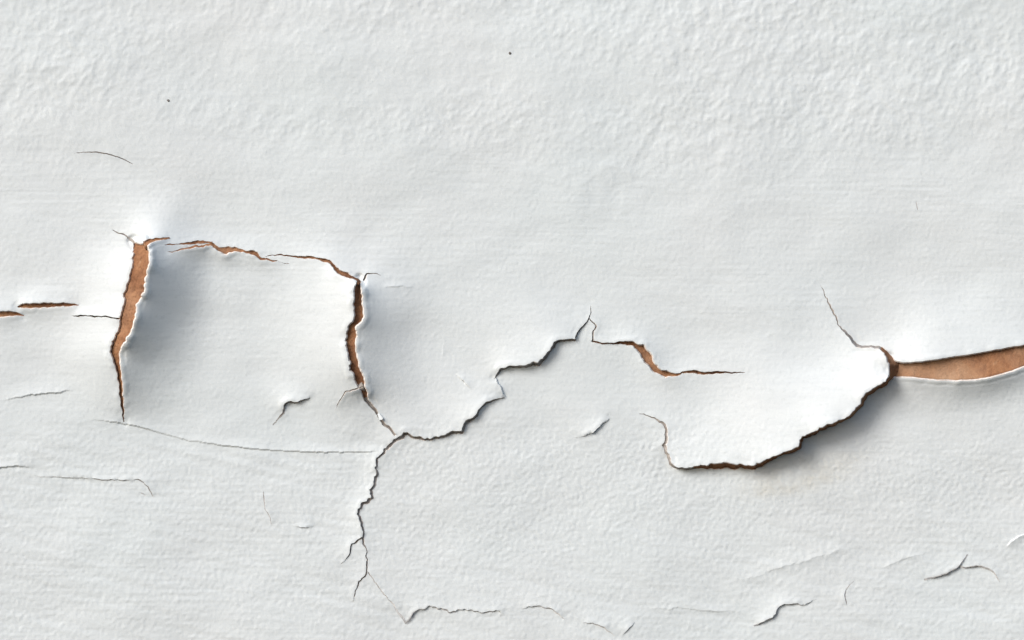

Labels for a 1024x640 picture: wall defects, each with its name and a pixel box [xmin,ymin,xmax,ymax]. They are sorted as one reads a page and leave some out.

peeling [51,187,594,449]
crack [588,316,744,387]
peeling [637,283,899,472]
crack [87,417,408,626]